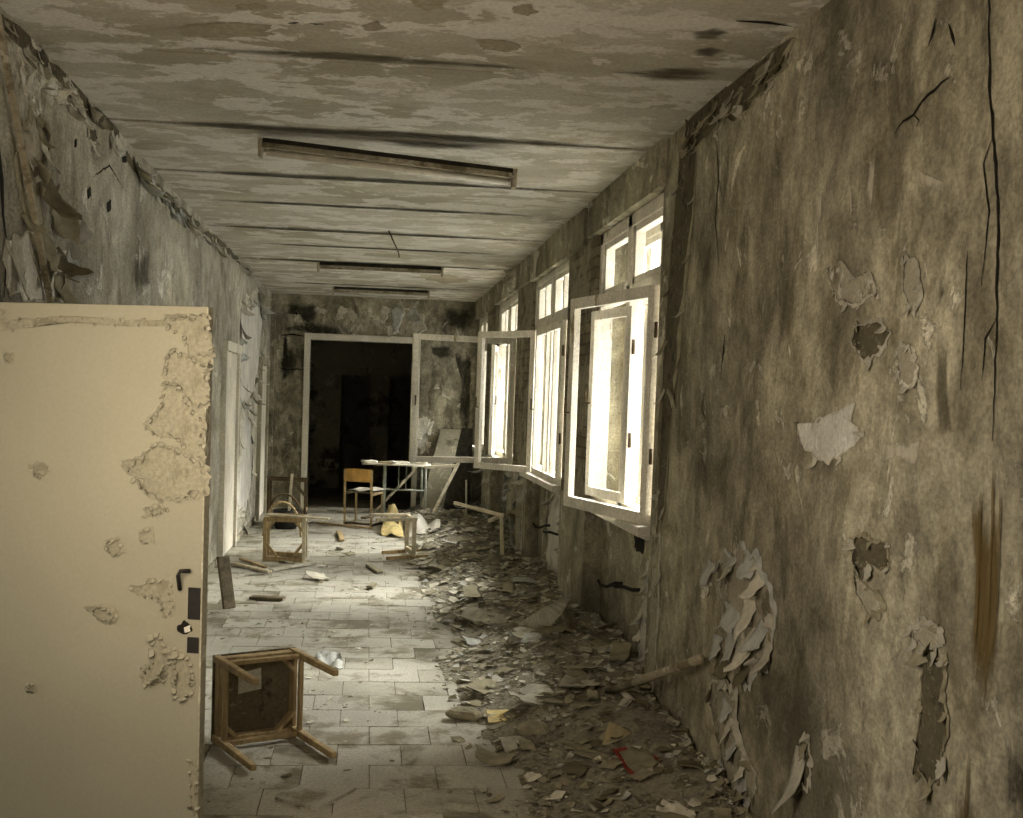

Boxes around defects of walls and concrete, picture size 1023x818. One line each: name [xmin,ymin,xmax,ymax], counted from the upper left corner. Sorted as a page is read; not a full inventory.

crack [928,18,955,46]
crack [894,77,949,135]
peeling [0,13,276,545]
damp [282,303,339,377]
damp [447,309,470,329]
flaking render [651,37,796,540]
peeling [823,259,919,394]
crack [960,0,1000,438]
flaking render [792,402,866,468]
peeling [399,469,777,818]
flaking render [842,531,892,625]
flaking render [902,616,950,802]